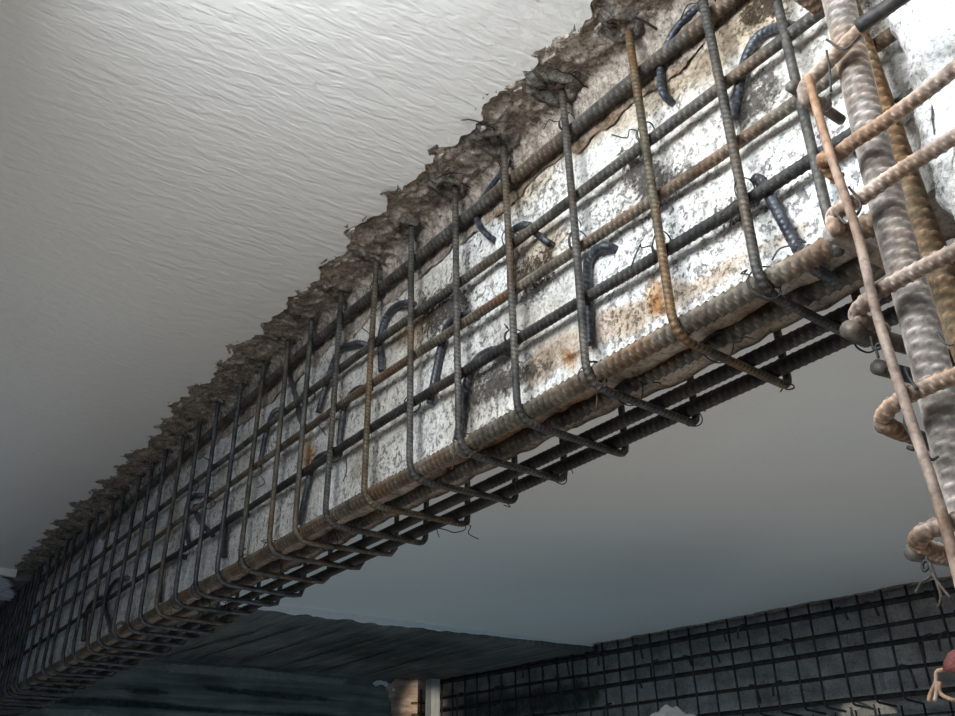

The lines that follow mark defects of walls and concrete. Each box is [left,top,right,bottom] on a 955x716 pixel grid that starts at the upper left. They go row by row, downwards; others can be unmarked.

spalling [731,0,774,38]
spalling [888,5,929,91]
spalling [714,66,778,129]
spalling [914,99,940,148]
spalling [615,146,692,211]
spalling [931,147,955,216]
spalling [717,215,742,233]
spalling [504,236,564,307]
spalling [416,273,474,339]
spalling [467,353,553,410]
peeling [0,576,15,601]
spalling [386,679,426,716]